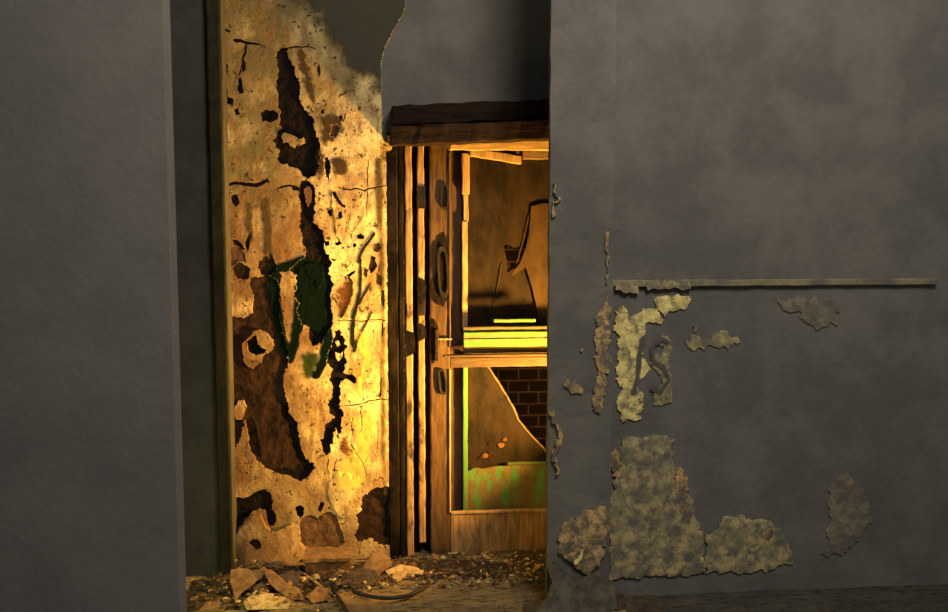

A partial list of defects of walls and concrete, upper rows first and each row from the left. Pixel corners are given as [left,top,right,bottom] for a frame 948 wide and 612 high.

peeling [227,60,246,115]
flaking render [261,47,385,456]
flaking render [231,235,315,481]
peeling [563,228,692,423]
peeling [685,324,740,351]
flaking render [236,489,276,532]
flaking render [295,486,389,548]
flaking render [557,434,794,580]